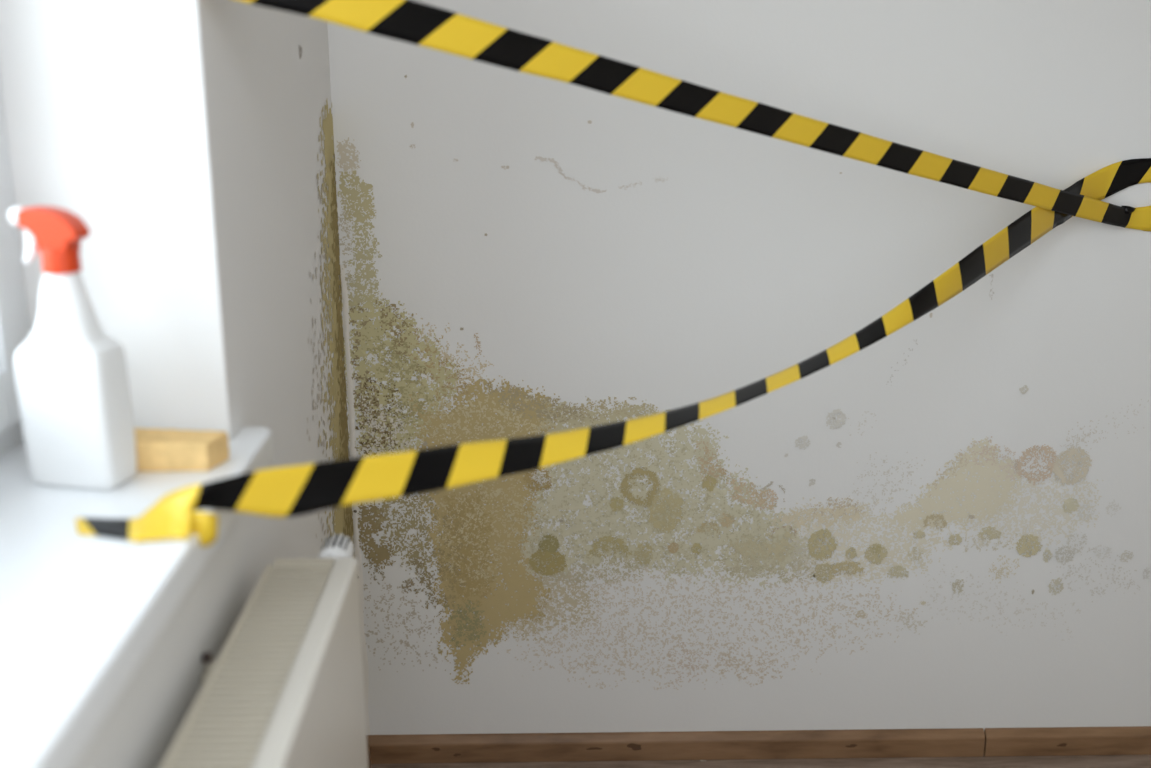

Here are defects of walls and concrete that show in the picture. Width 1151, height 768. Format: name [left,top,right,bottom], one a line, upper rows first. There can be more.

water stain [307,100,669,462]
water stain [316,399,1150,690]